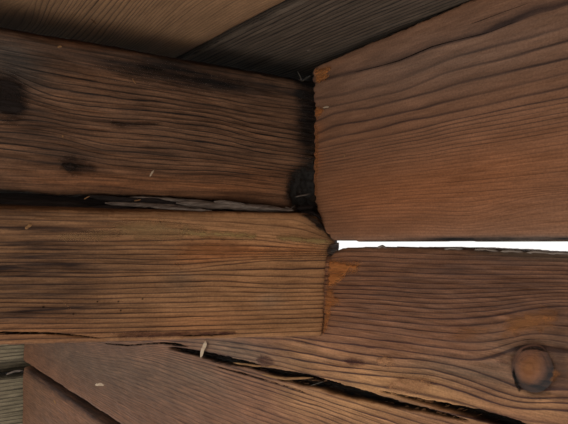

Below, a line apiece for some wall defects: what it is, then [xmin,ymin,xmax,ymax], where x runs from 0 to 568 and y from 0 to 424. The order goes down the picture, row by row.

crack [0,332,526,424]
crack [521,345,546,353]